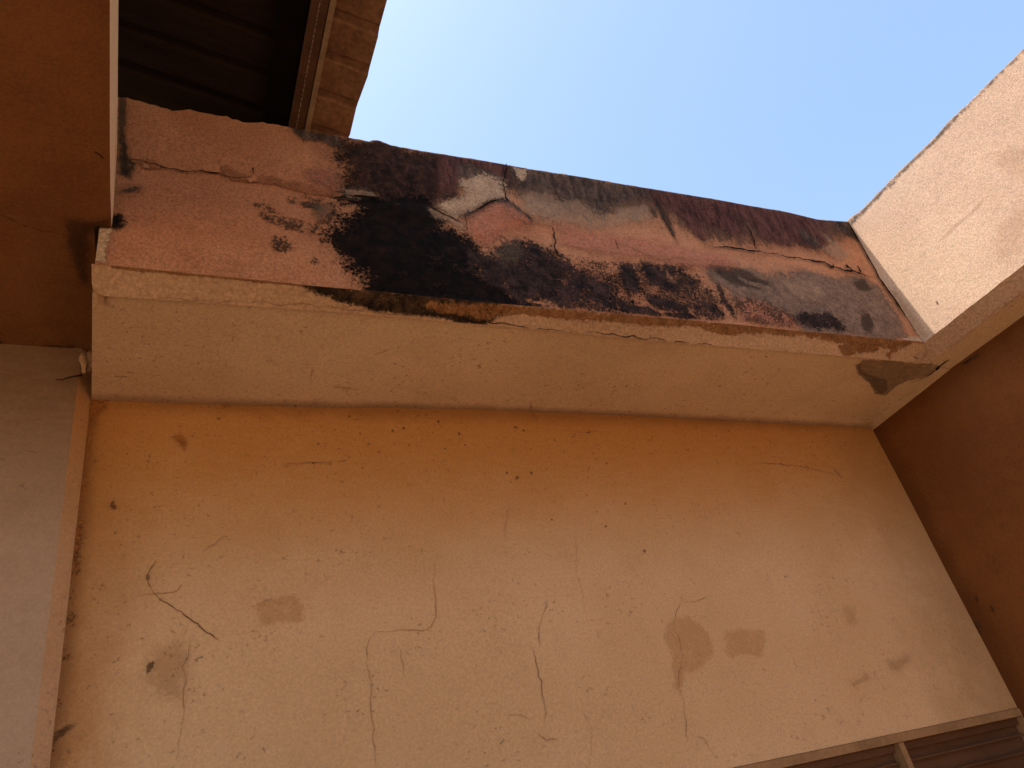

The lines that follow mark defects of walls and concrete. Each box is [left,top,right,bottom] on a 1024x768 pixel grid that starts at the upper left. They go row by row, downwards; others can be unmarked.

crack [134,159,254,178]
leakage [253,50,1024,340]
crack [456,319,711,345]
crack [615,223,1020,382]
crack [137,560,219,758]
crack [366,552,440,766]
crack [507,599,556,740]